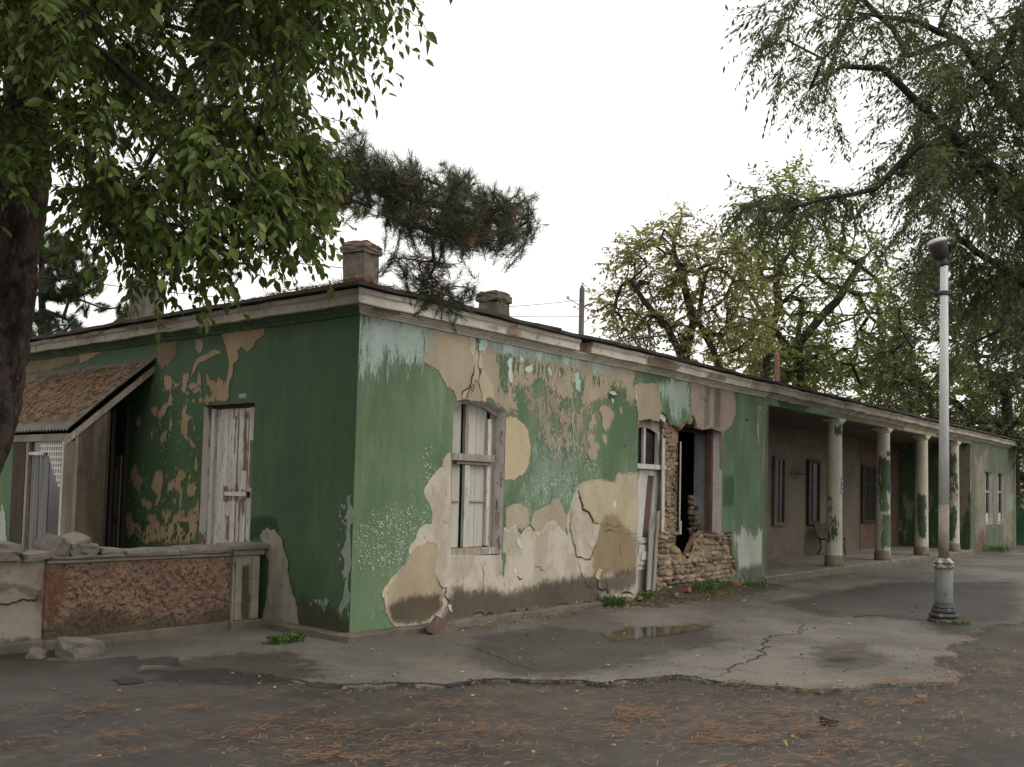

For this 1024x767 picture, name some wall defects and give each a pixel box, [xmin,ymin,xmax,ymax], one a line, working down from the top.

crack [0,594,41,606]
peeling [126,328,265,546]
flaking render [310,338,639,627]
water stain [390,570,636,623]
crack [436,491,633,616]
spalling [654,413,762,589]